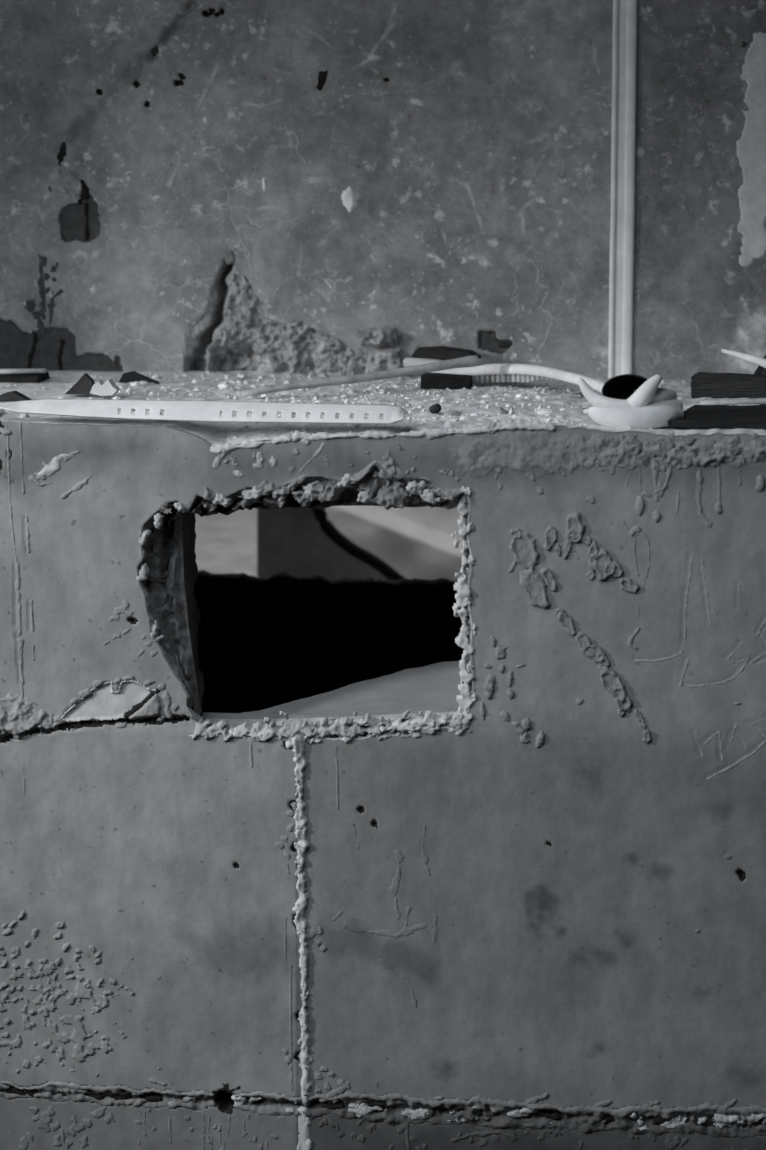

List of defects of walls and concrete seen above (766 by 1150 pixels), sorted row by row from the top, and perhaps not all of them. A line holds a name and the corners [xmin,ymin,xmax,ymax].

peeling [47,134,100,243]
peeling [0,254,160,384]
spalling [184,249,412,377]
spalling [28,449,81,487]
spalling [37,420,556,749]